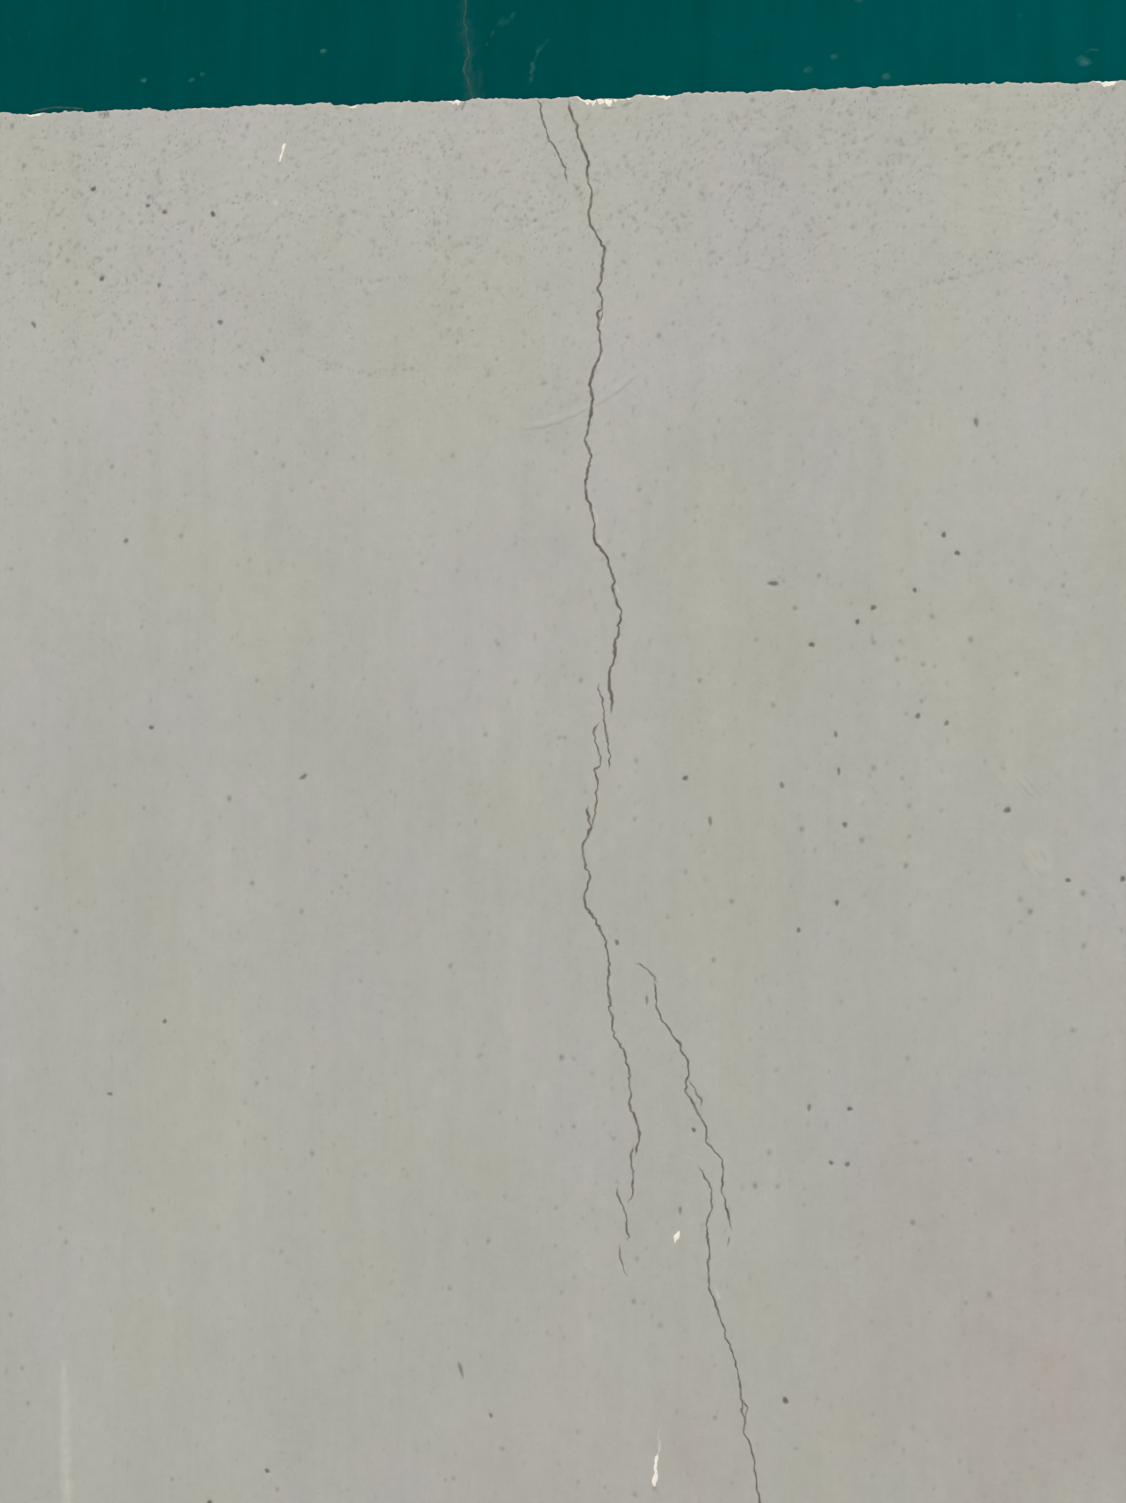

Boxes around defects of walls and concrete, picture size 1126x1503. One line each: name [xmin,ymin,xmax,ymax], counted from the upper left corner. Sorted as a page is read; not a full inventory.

crack [537,98,762,1503]